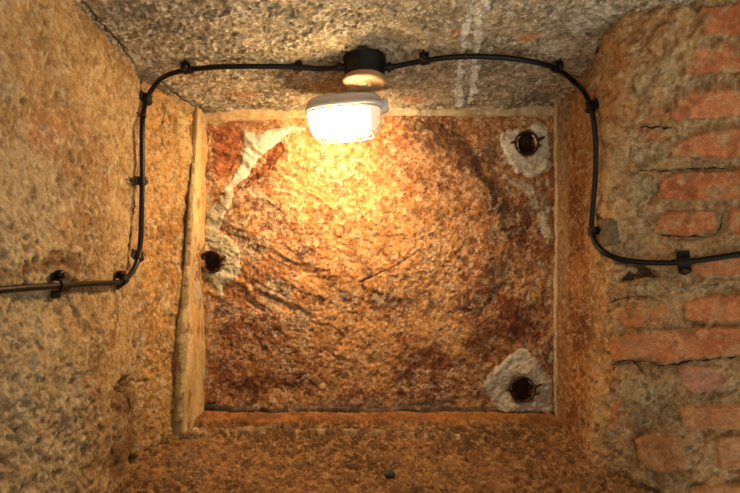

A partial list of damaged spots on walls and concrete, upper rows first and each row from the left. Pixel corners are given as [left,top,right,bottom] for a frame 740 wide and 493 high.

efflorescence [450,0,491,108]
crack [638,165,729,173]
damp [204,172,234,242]
crack [659,215,723,238]
crack [610,355,737,373]